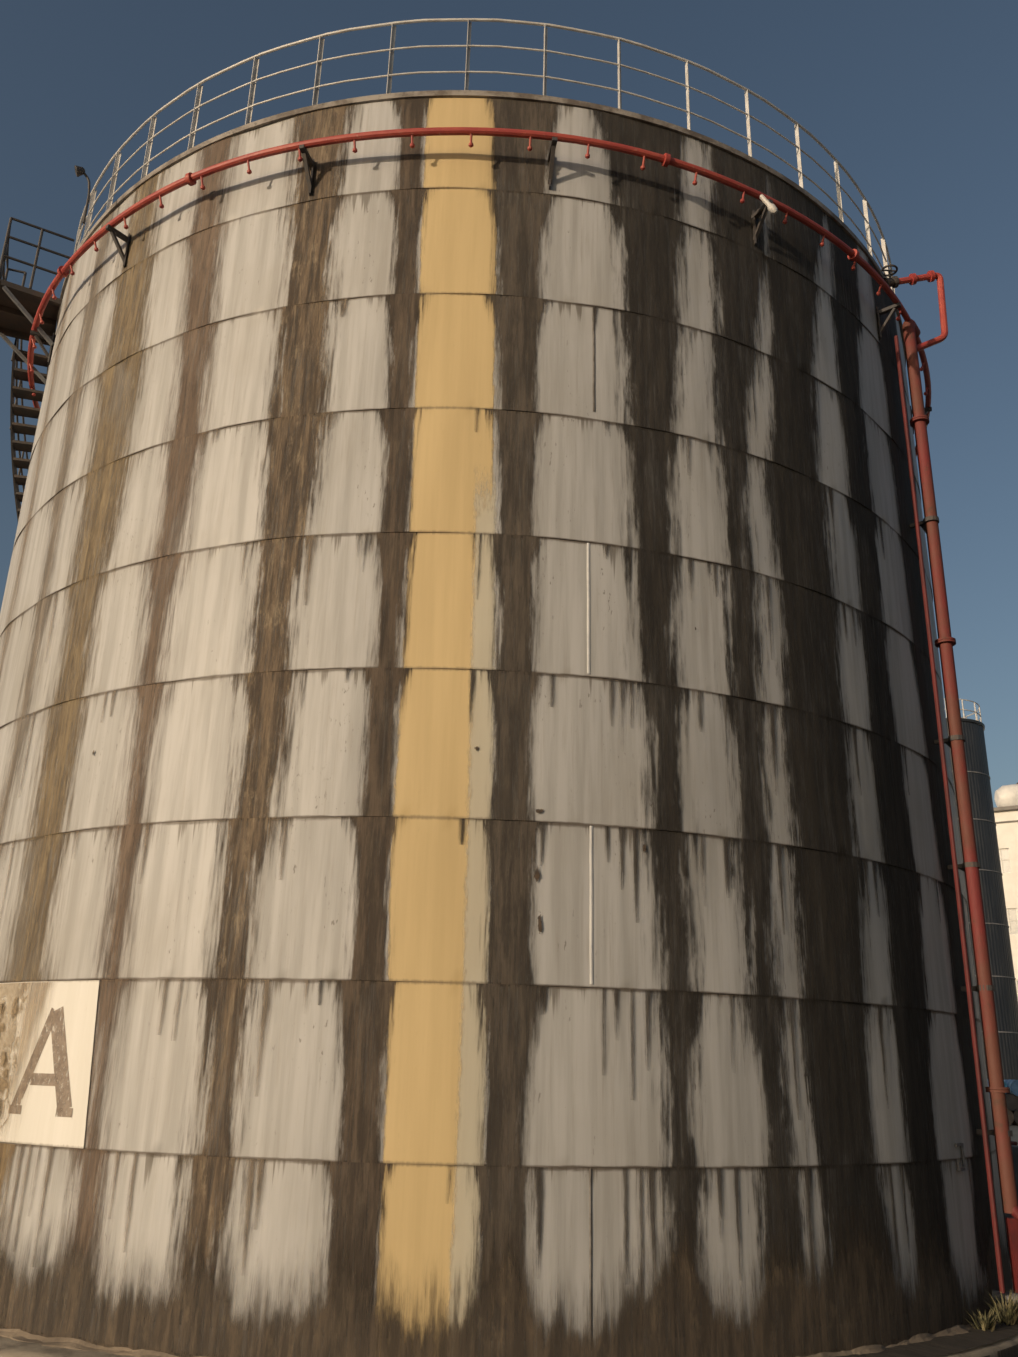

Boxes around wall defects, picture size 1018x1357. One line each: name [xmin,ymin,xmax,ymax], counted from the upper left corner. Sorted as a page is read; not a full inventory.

peeling [0,982,29,1128]
damp [0,1143,53,1262]
damp [0,167,170,1080]
damp [68,135,239,1269]
damp [172,104,357,1292]
damp [306,98,430,1300]
damp [469,98,560,1299]
damp [590,109,1000,1290]